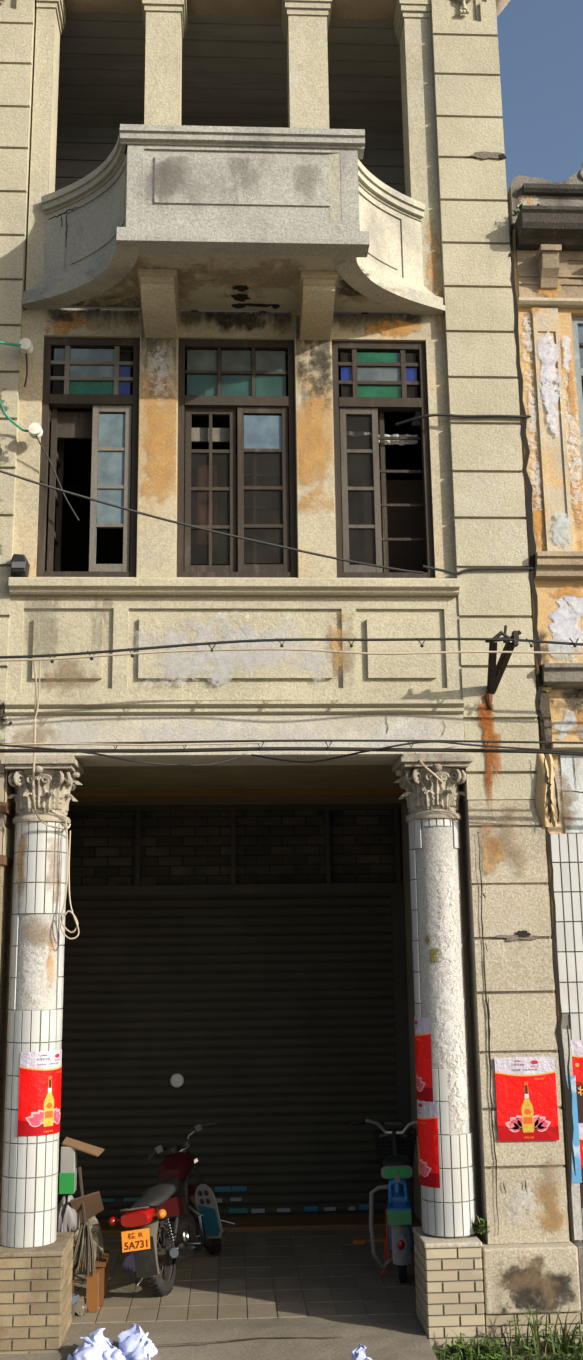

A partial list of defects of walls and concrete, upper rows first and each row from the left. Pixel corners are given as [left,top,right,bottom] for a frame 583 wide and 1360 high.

leakage [339,276,360,296]
leakage [427,222,442,297]
leakage [334,313,420,336]
leakage [47,297,176,501]
leakage [182,311,334,473]
peeling [522,317,583,548]
peeling [167,615,324,683]
peeling [539,587,583,663]
corrosion [478,691,502,803]
leakage [502,1258,575,1313]